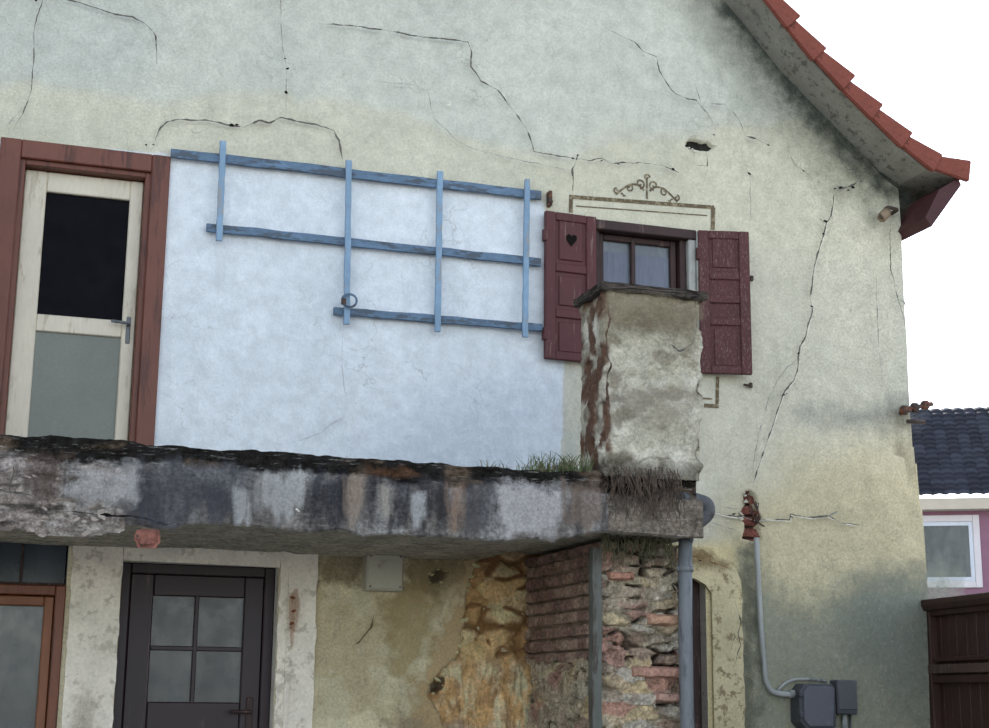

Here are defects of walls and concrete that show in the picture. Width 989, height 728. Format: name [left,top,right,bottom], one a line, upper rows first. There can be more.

crack [8,0,43,128]
crack [68,0,157,59]
crack [145,0,343,161]
spalling [685,134,716,152]
crack [319,23,862,486]
damp [25,455,352,529]
damp [369,475,448,527]
crack [710,507,861,532]
spalling [427,552,544,728]